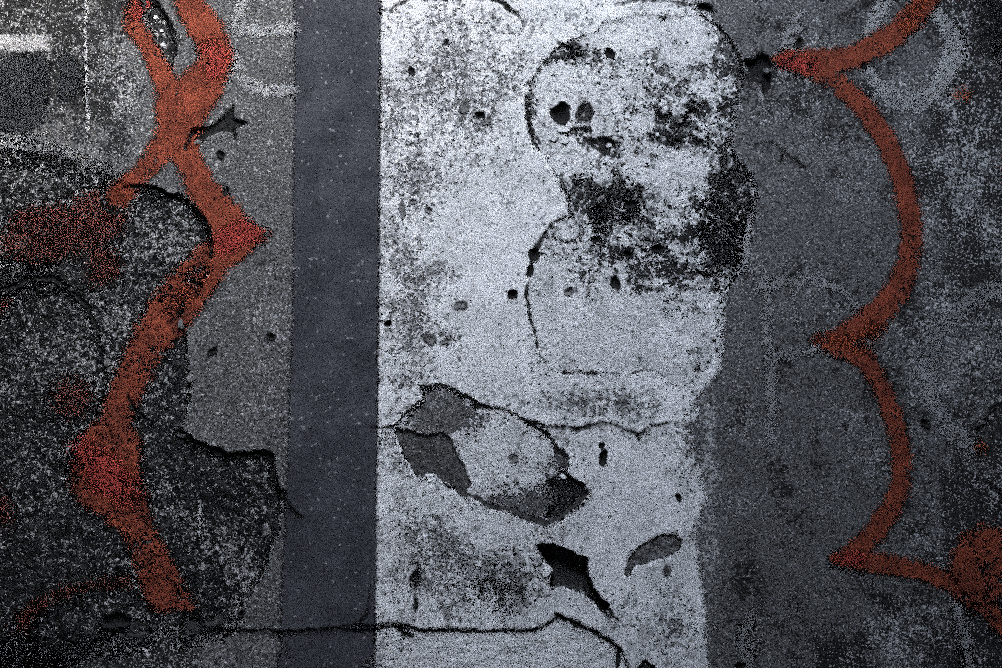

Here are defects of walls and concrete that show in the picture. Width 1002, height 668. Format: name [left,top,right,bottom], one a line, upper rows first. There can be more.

crack [380,0,408,12]
crack [494,0,525,24]
crack [614,0,744,73]
crack [524,291,539,349]
flaking render [0,148,284,665]
peeling [394,384,592,526]
crack [199,538,624,668]
hole [537,543,610,613]
peeling [624,534,683,576]